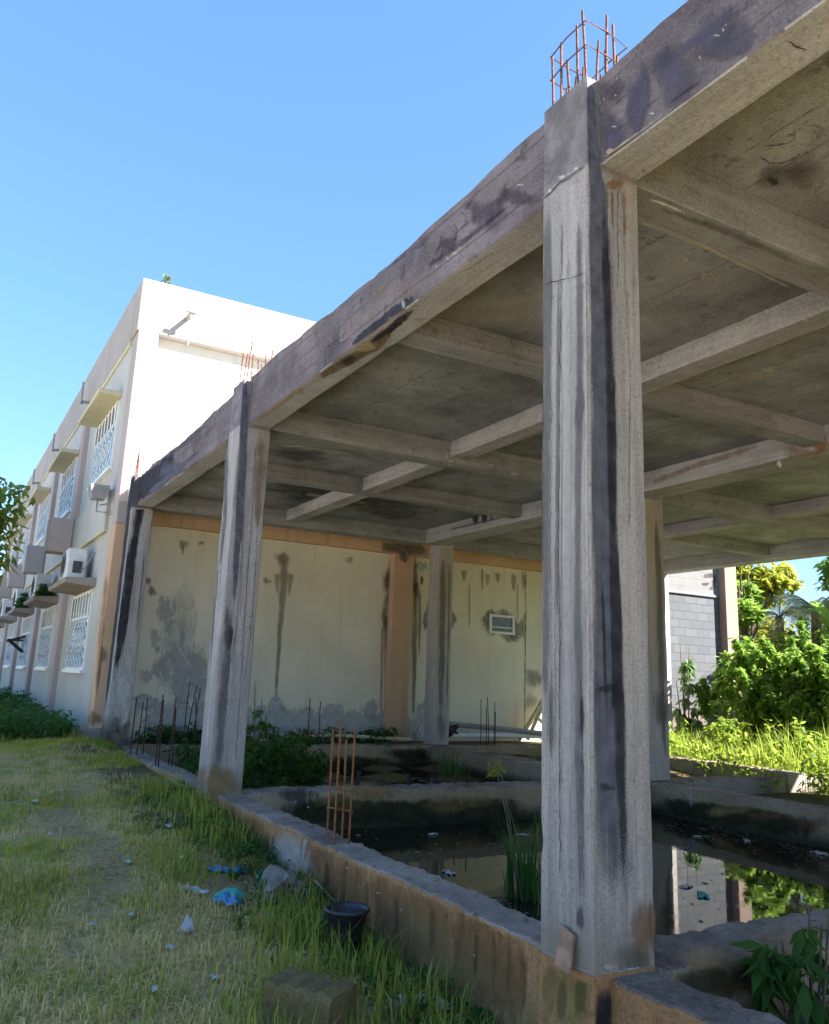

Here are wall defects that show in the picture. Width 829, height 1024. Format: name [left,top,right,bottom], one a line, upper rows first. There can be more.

water stain [104,428,201,736]
water stain [265,553,291,693]
spalling [321,297,414,378]
water stain [383,543,426,708]
water stain [522,222,562,692]
crack [521,401,584,885]
crack [543,223,583,374]
water stain [574,50,689,887]